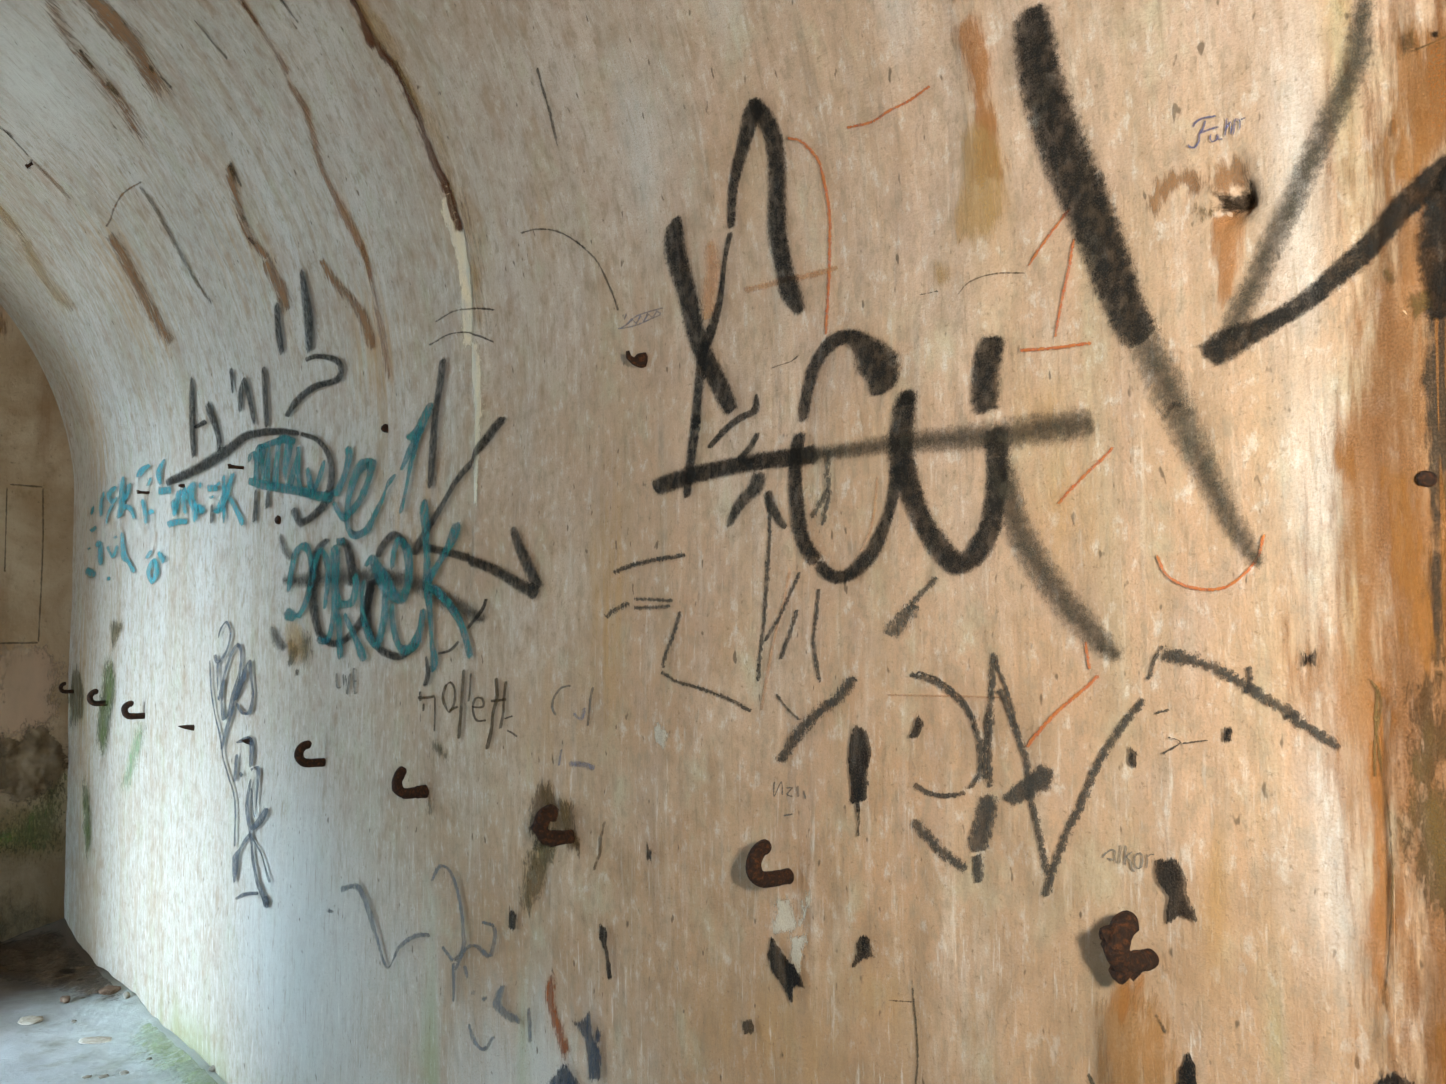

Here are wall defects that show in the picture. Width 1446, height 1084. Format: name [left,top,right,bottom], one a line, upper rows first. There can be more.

rust [960,19,1002,235]
rust [1150,168,1201,216]
rust [1213,211,1240,299]
flaking render [0,645,68,802]
rust [1099,925,1142,985]